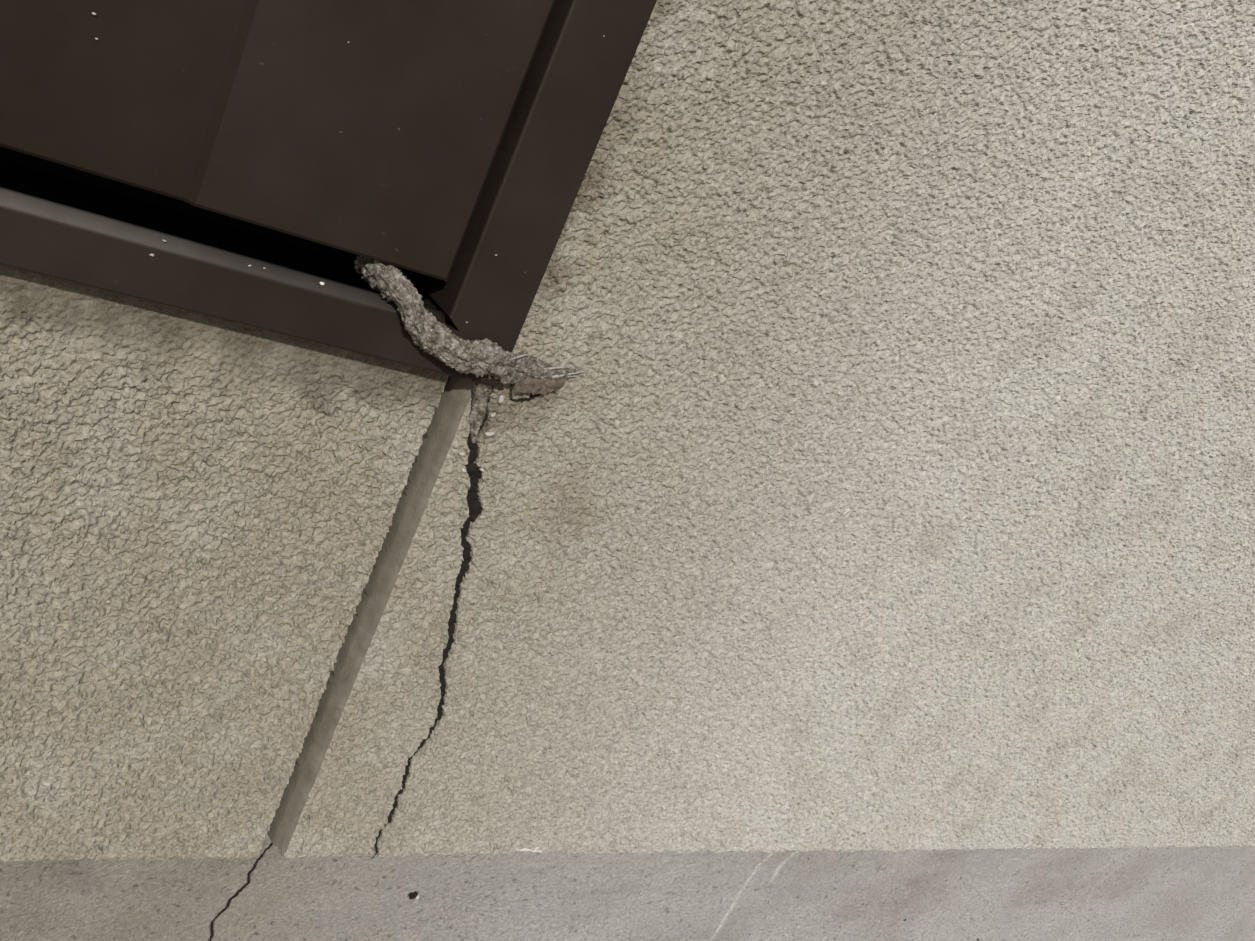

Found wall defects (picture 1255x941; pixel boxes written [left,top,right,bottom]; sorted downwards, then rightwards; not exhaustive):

crack [371,393,541,859]
crack [209,843,273,941]